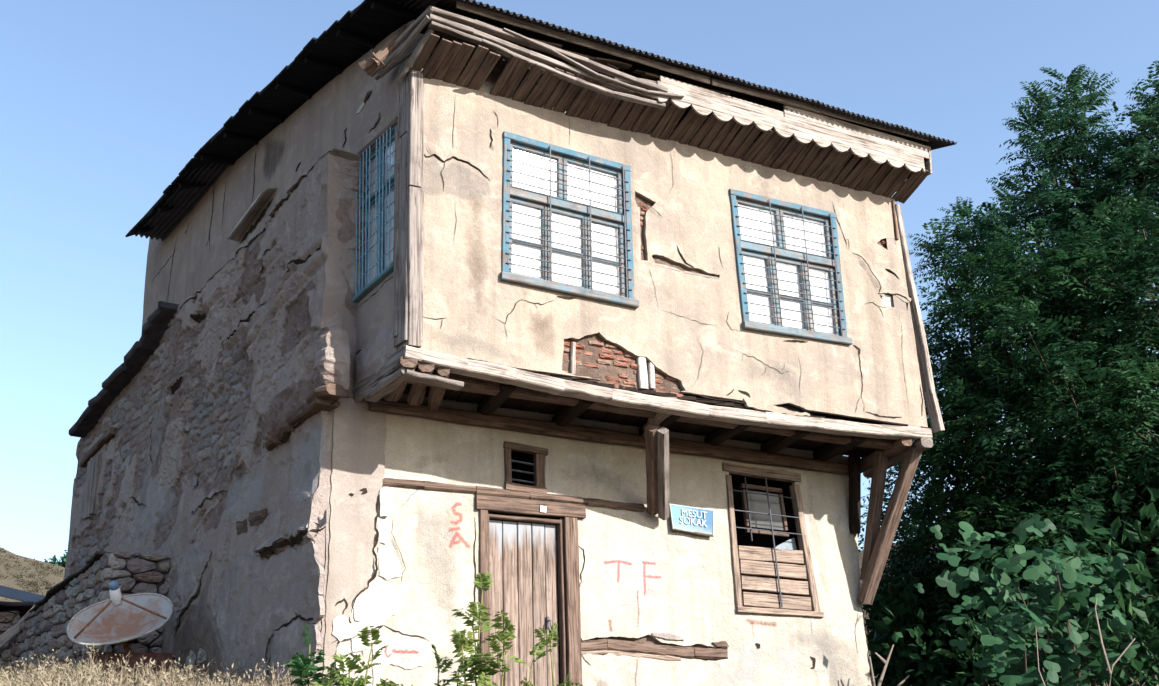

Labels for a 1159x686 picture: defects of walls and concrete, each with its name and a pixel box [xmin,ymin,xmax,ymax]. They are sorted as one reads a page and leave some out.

crack [151,111,380,319]
spalling [558,334,684,398]
spalling [635,194,719,279]
crack [677,245,723,268]
crack [650,272,808,403]
crack [833,205,923,418]
spalling [254,509,327,557]
crack [265,523,382,682]
spalling [332,486,430,686]